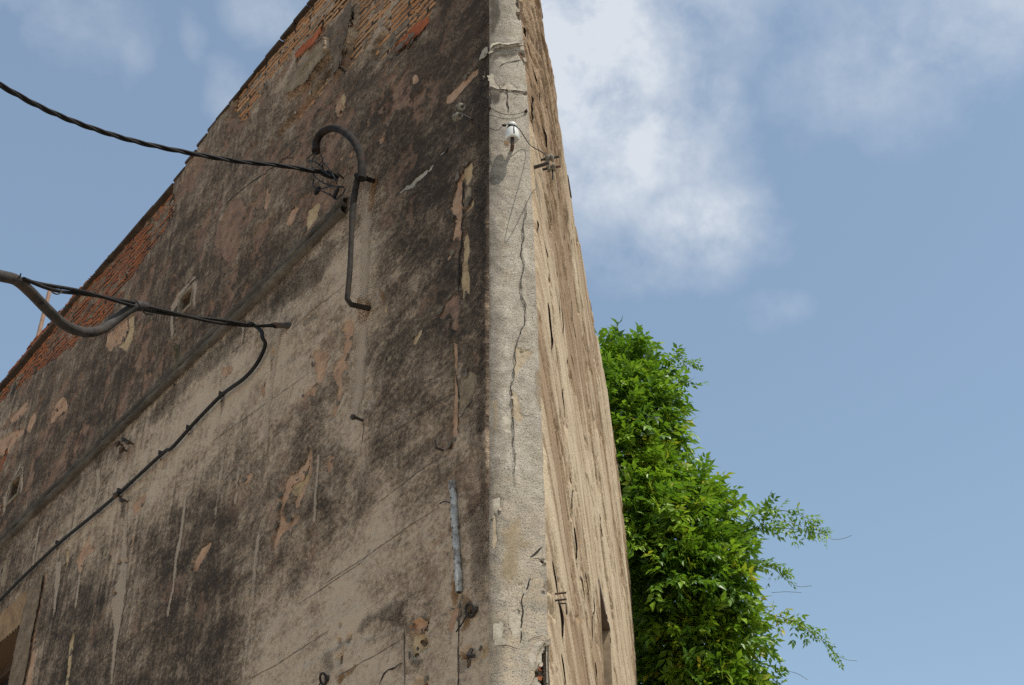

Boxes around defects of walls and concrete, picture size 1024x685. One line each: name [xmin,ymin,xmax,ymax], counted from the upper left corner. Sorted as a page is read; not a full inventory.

spalling [235,0,436,122]
peeling [446,47,526,104]
spalling [0,193,175,402]
spalling [438,161,477,451]
crack [504,206,576,472]
peeling [50,397,69,425]
leakage [53,561,62,616]
leakage [110,503,129,684]
leakage [167,497,186,617]
spalling [273,449,313,552]